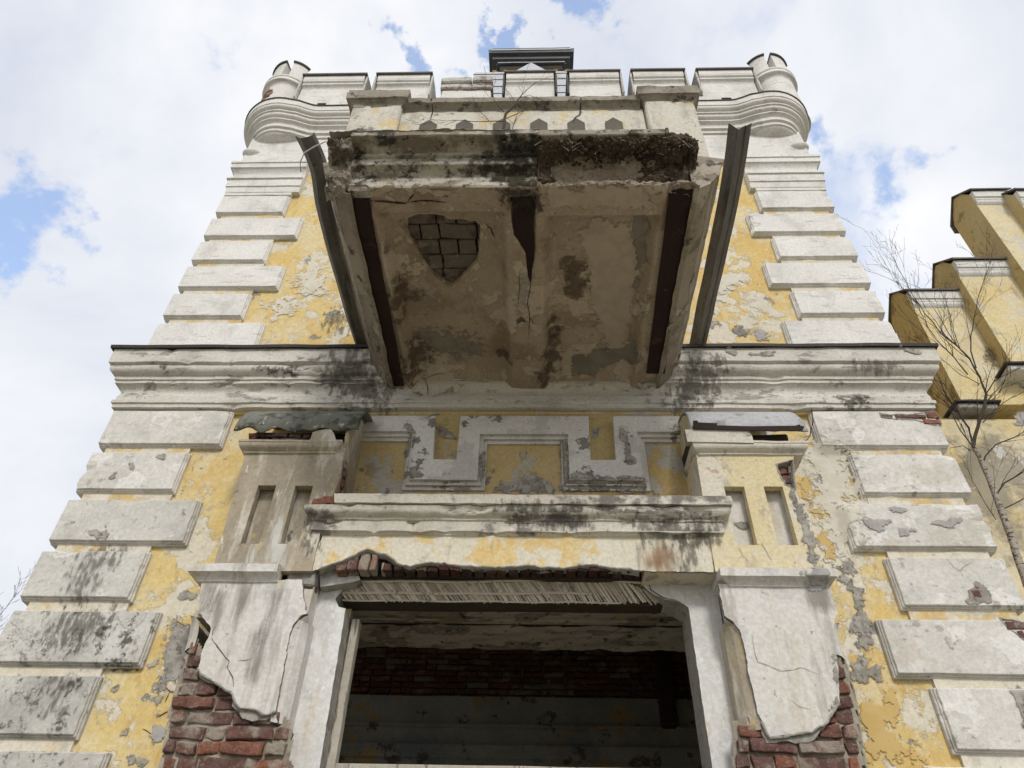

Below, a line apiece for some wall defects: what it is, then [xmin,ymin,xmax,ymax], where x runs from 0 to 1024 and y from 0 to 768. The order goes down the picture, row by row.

damp [479,134,541,173]
peeling [258,265,336,322]
spalling [403,212,484,289]
crack [517,266,535,330]
damp [559,256,591,300]
peeling [710,272,787,356]
peeling [493,428,648,495]
peeling [931,518,963,528]
flaking render [305,548,640,593]
flaking render [730,431,931,768]
damp [95,625,138,672]
flaking render [126,615,294,768]